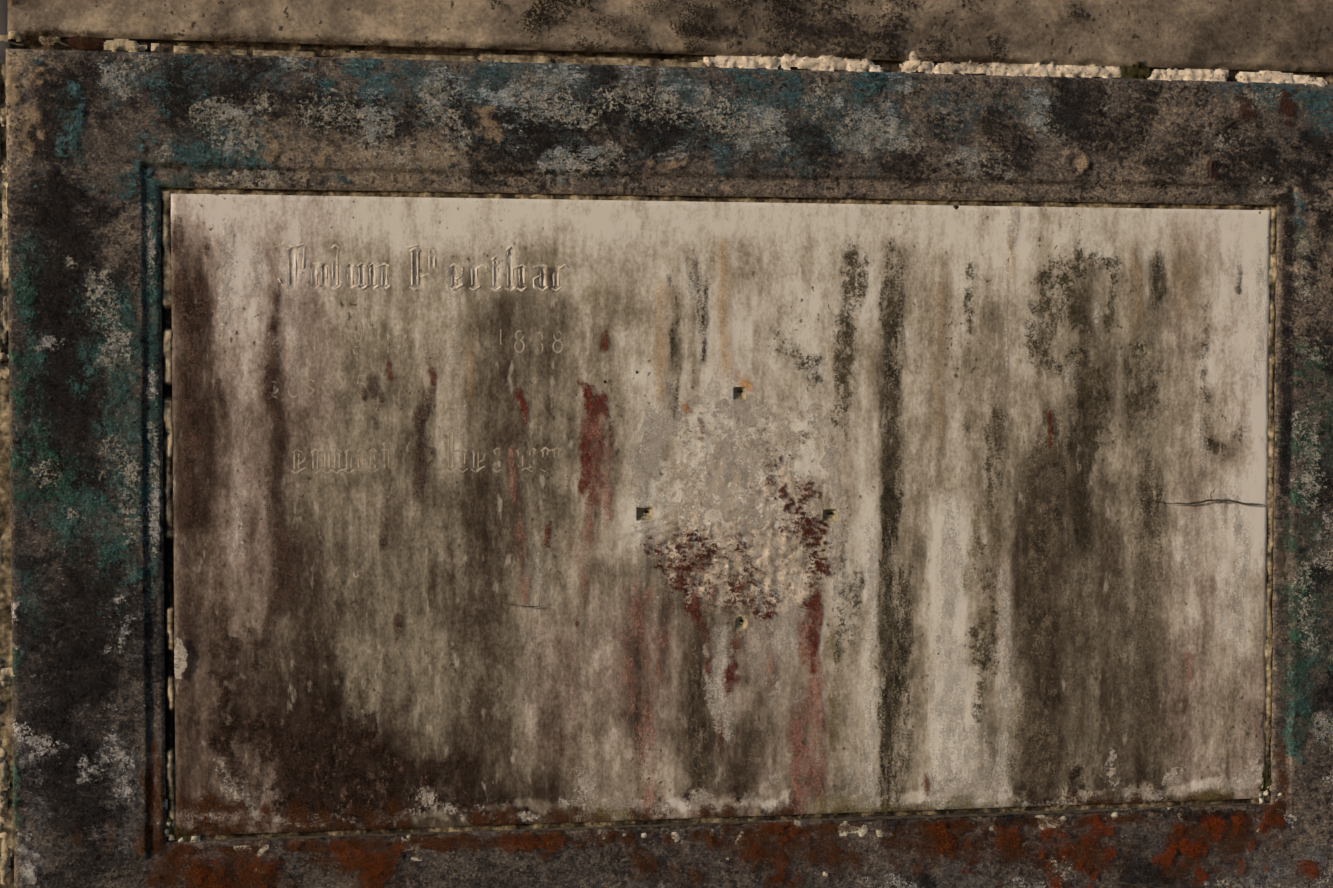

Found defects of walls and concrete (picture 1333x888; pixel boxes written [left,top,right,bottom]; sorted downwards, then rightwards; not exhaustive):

water stain [0,0,1333,568]
water stain [0,529,159,888]
water stain [207,282,541,828]
corrosion [134,408,1291,888]
water stain [558,239,1265,832]
water stain [886,859,993,888]
crack [1136,489,1263,505]
water stain [1293,471,1333,622]
water stain [1311,669,1333,744]